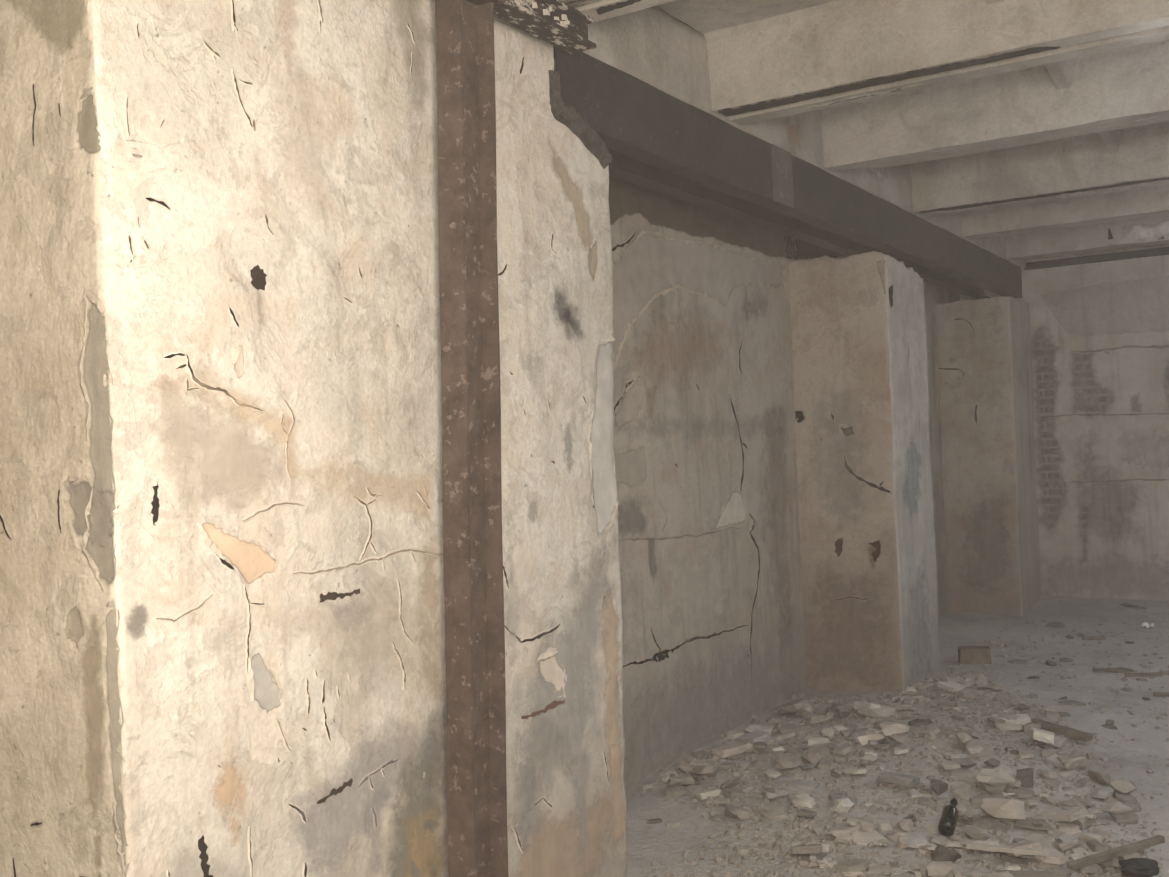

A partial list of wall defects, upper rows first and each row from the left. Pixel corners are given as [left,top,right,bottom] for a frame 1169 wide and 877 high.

peeling [515,1,570,27]
crack [163,351,305,523]
crack [843,454,893,494]
crack [619,337,788,688]
flaking render [196,522,280,584]
flaking render [247,653,284,712]
flaking render [521,651,566,719]
crack [11,858,19,877]